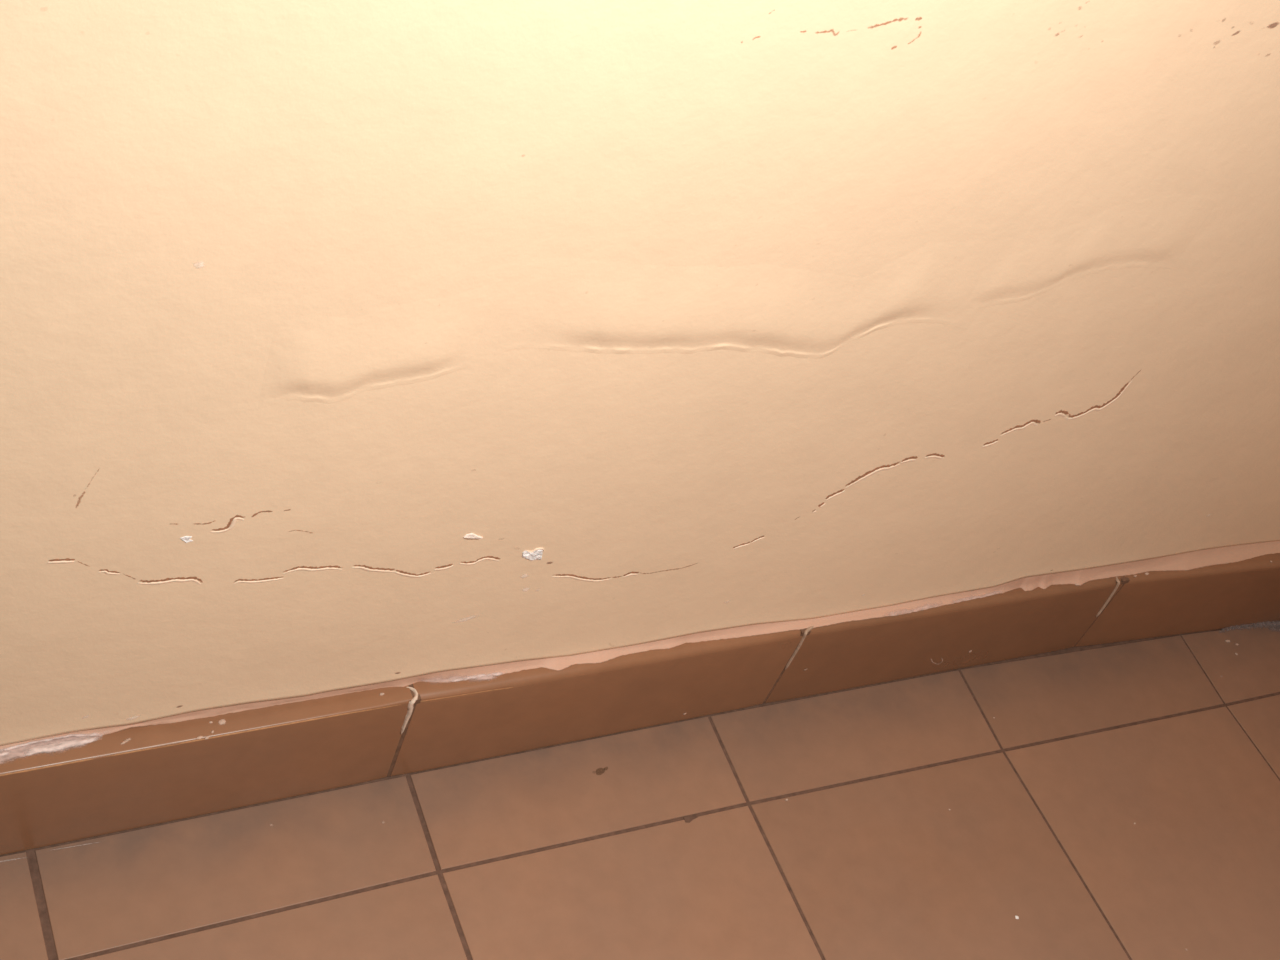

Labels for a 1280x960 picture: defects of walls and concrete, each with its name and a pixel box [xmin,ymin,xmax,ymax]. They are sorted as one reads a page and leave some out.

crack [872,17,922,49]
crack [982,370,1141,448]
crack [813,453,944,513]
crack [198,509,312,533]
crack [733,536,765,550]
crack [47,558,202,585]
crack [234,556,500,584]
crack [552,563,697,582]
peeling [0,541,1280,750]